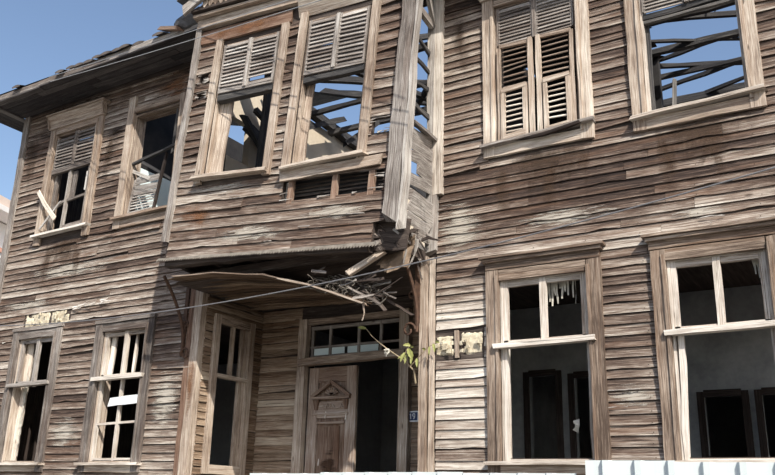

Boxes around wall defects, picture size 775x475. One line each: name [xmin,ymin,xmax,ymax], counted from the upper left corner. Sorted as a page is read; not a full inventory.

flaking render [5,300,70,327]
flaking render [435,332,483,356]